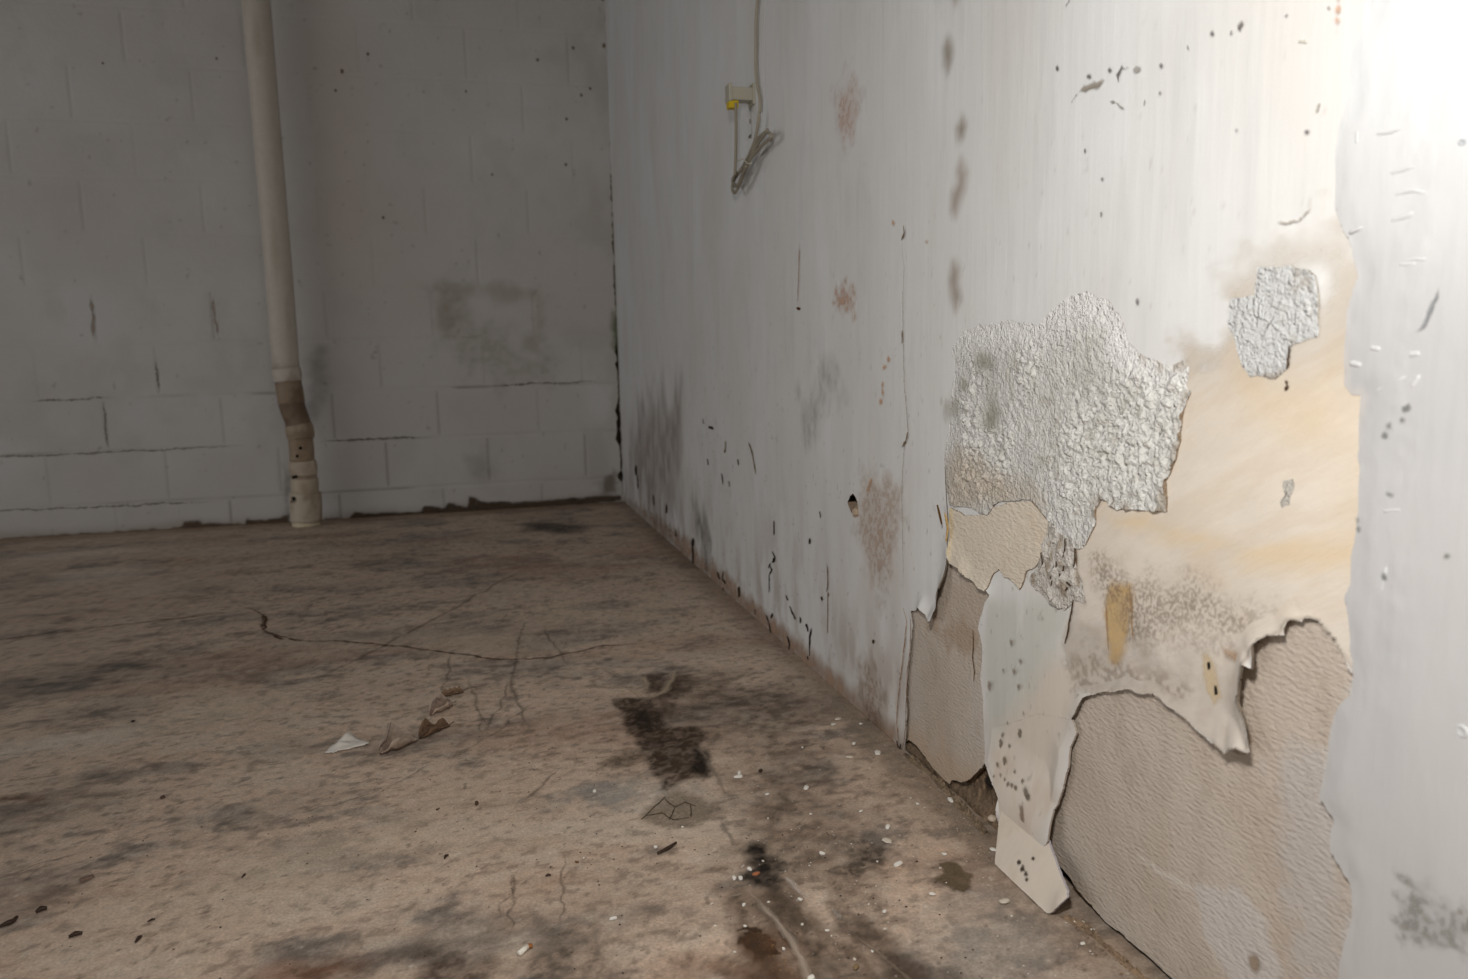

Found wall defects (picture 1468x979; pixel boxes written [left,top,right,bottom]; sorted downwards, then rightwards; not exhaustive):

crack [256,611,626,660]
damp [1105,585,1133,663]
peeling [903,265,1361,979]